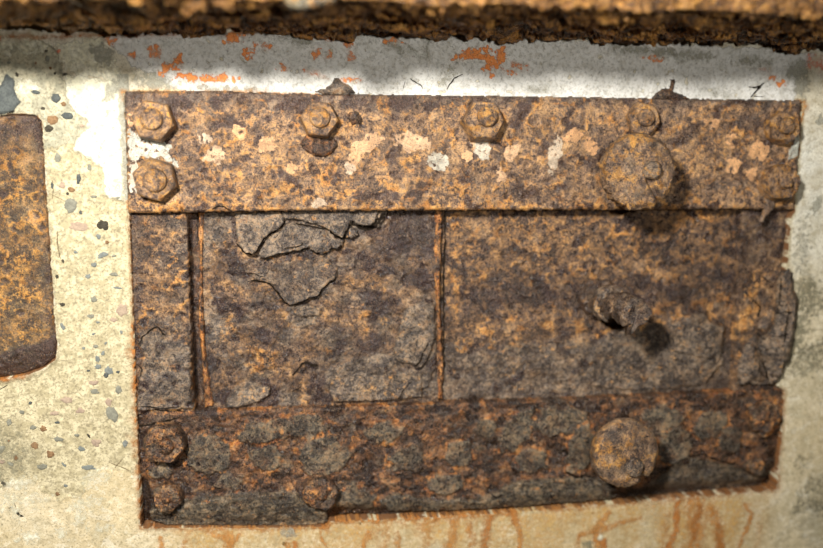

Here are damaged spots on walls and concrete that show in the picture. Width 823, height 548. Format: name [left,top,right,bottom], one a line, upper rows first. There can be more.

rust [285,0,335,11]
peeling [100,31,823,101]
spalling [0,36,138,508]
crack [236,214,385,306]
rust [235,210,387,318]
rust [329,302,436,402]
rust [586,313,725,391]
rust [226,385,270,408]
rust [746,389,783,438]
rust [139,492,380,548]
rust [382,476,616,548]
rust [666,494,725,548]